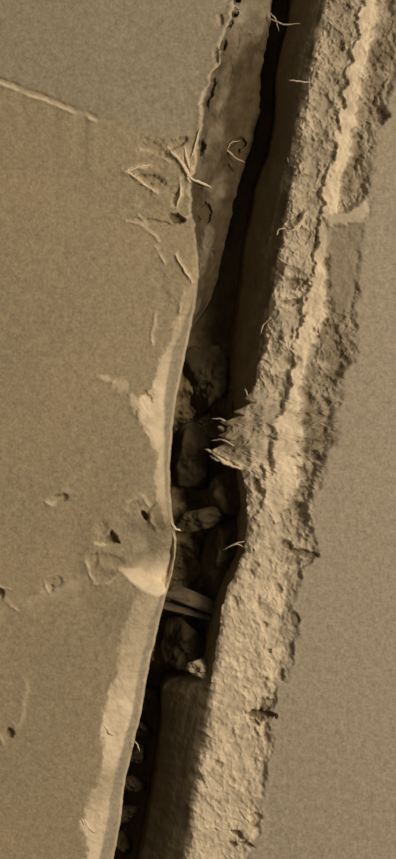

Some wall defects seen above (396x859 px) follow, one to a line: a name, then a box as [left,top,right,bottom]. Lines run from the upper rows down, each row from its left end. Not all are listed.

peeling [93,129,212,496]
crack [114,0,327,859]
spalling [185,0,396,859]